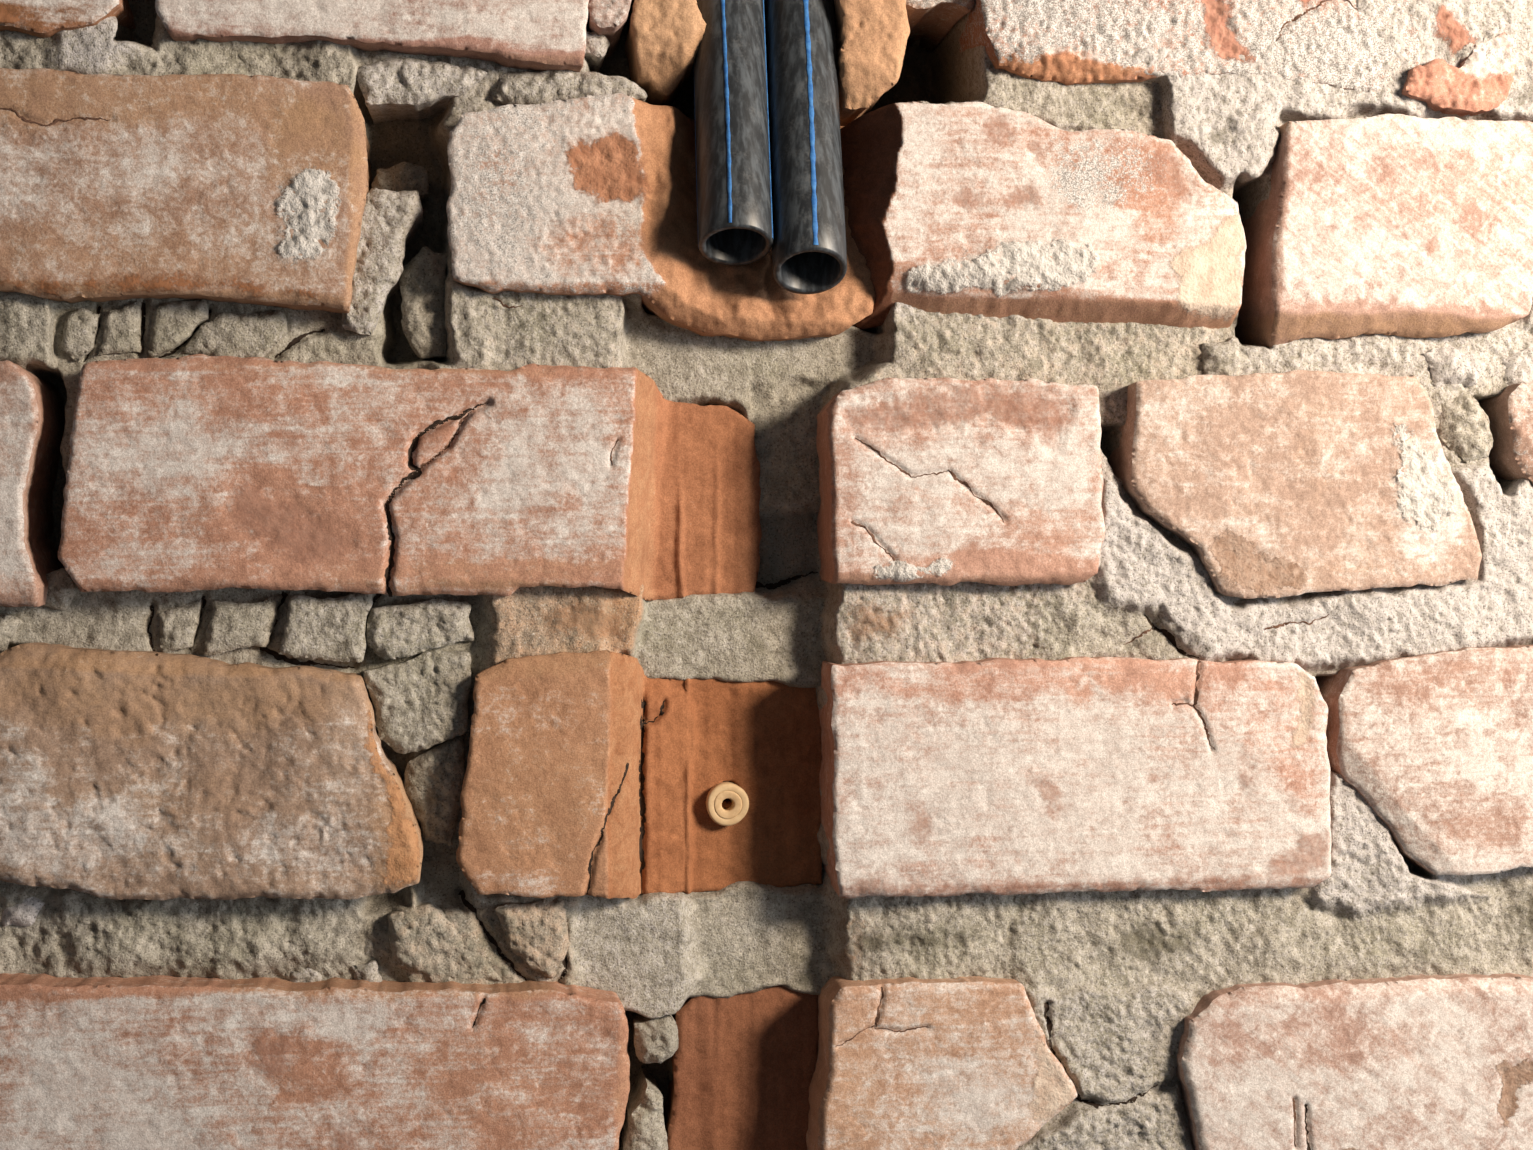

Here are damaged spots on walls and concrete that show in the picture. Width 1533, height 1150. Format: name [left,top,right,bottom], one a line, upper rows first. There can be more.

spalling [1201,0,1256,62]
crack [1276,0,1358,41]
spalling [1436,5,1477,54]
crack [856,438,1004,523]
crack [260,403,488,669]
crack [851,521,895,561]
crack [146,605,154,651]
crack [1124,615,1215,750]
crack [458,699,665,981]
crack [837,987,928,1046]
crack [1293,1098,1311,1150]